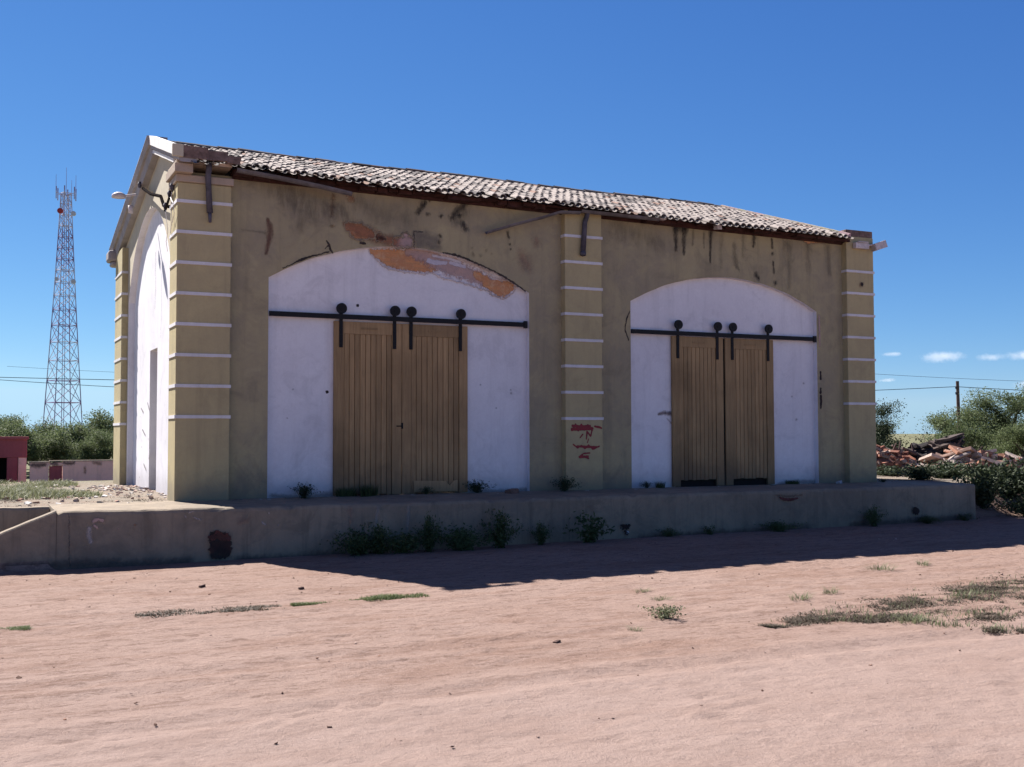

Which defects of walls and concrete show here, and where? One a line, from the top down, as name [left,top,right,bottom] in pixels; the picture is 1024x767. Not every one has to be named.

crack [283,240,333,269]
flaking render [344,220,516,300]